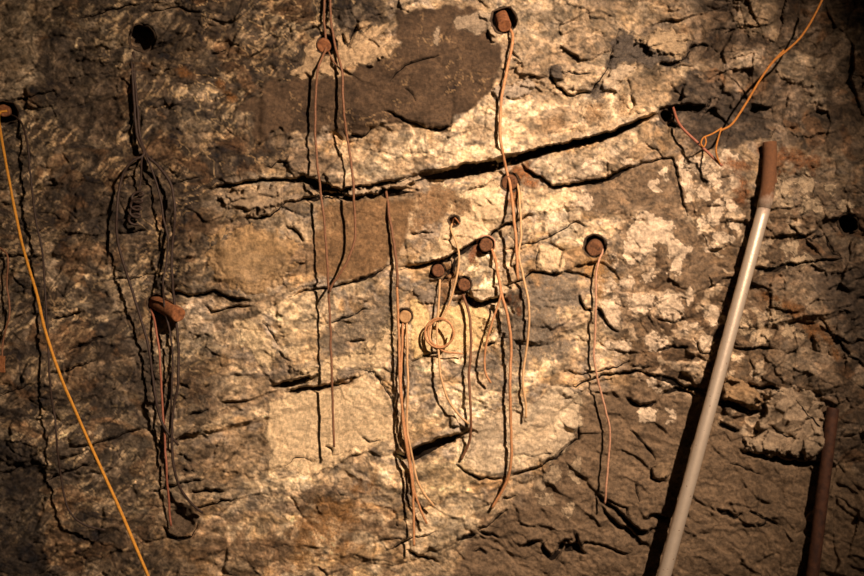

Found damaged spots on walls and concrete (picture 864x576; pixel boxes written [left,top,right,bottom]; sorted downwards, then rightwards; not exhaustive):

crack [181,103,709,242]
rust [507,160,537,206]
rust [469,244,484,267]
crack [659,338,711,354]
crack [736,345,774,353]
crack [820,318,864,367]
crack [562,361,702,407]
crack [396,432,466,460]
crack [718,383,823,474]
crack [456,425,579,554]
crack [523,430,668,560]
crack [716,508,779,526]